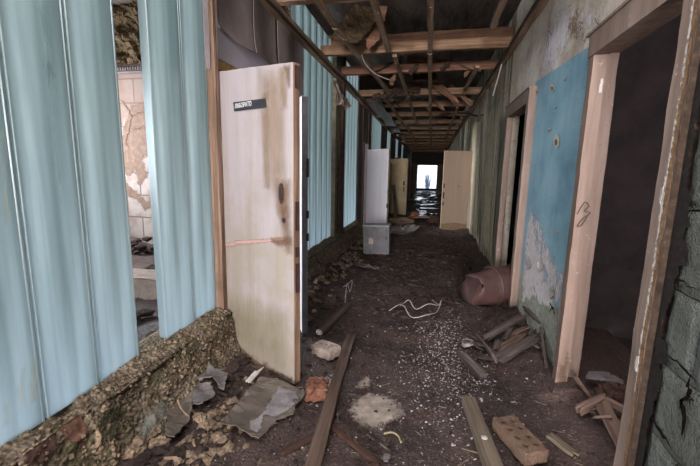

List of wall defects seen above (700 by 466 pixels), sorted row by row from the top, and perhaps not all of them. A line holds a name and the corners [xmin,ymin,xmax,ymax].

crack [120,100,145,149]
flaking render [122,103,151,210]
peeling [522,211,563,310]
crack [650,354,698,450]